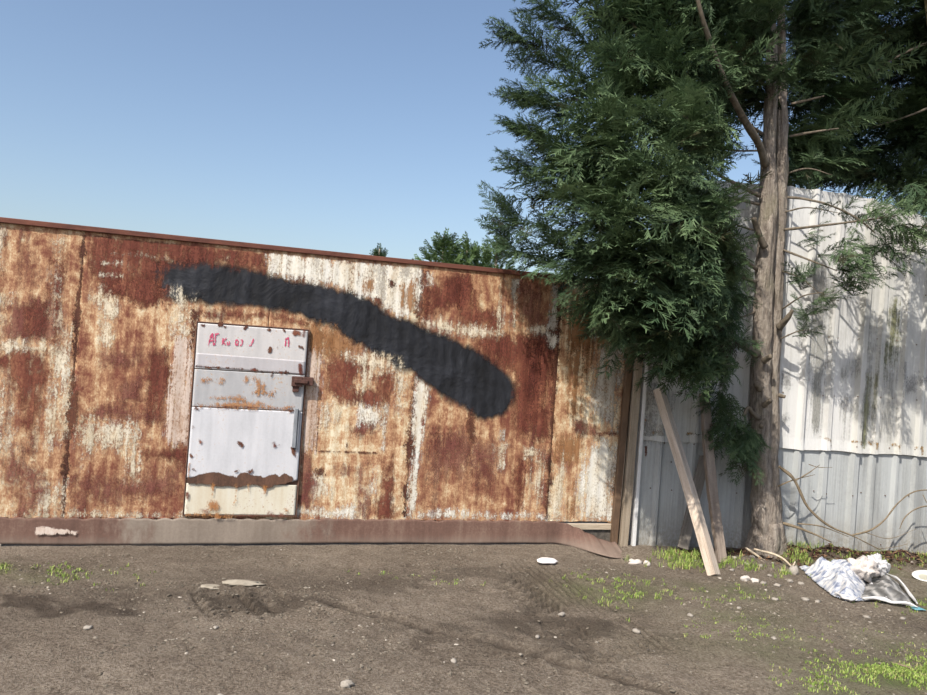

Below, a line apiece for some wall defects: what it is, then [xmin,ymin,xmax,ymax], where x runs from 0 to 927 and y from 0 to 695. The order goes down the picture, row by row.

corrosion [0,228,68,517]
corrosion [60,235,416,520]
corrosion [388,270,617,519]
water stain [841,300,922,449]